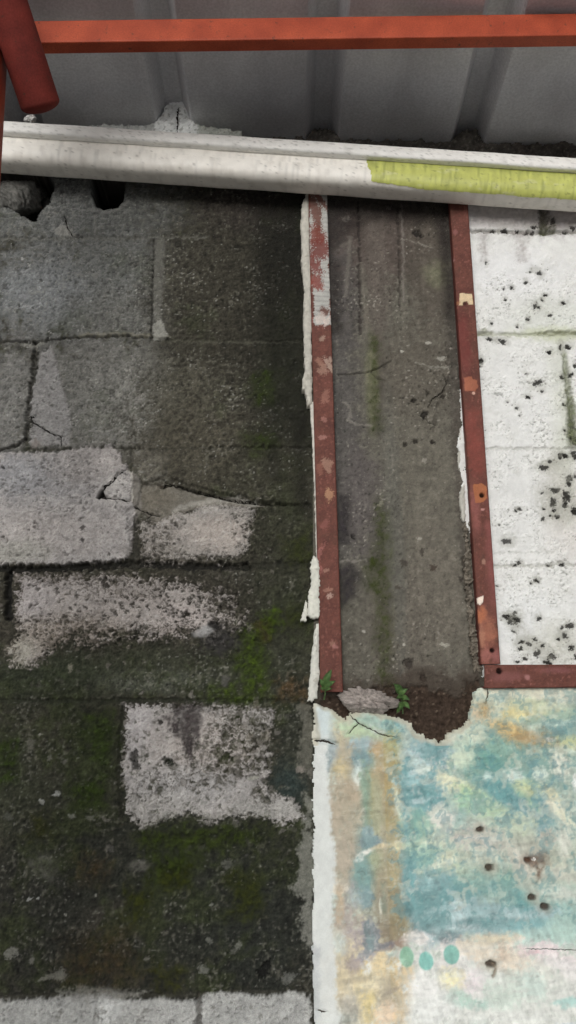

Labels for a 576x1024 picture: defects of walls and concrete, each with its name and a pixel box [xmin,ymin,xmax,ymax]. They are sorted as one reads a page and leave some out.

crack [102,470,159,518]
crack [163,482,278,506]
spalling [374,485,483,743]
crack [314,715,398,745]